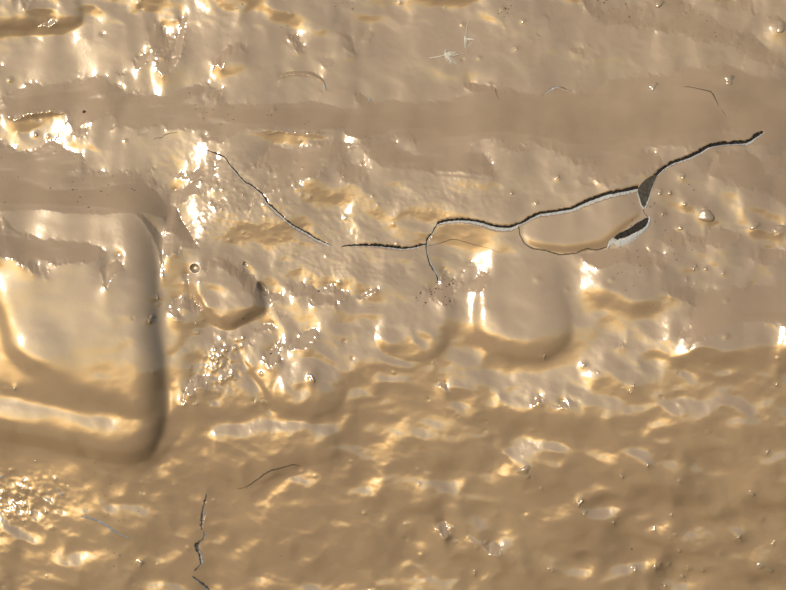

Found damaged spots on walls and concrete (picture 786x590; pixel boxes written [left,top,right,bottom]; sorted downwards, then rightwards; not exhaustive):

crack [654,131,764,177]
crack [198,145,648,283]
peeling [522,175,657,252]
crack [192,494,209,590]